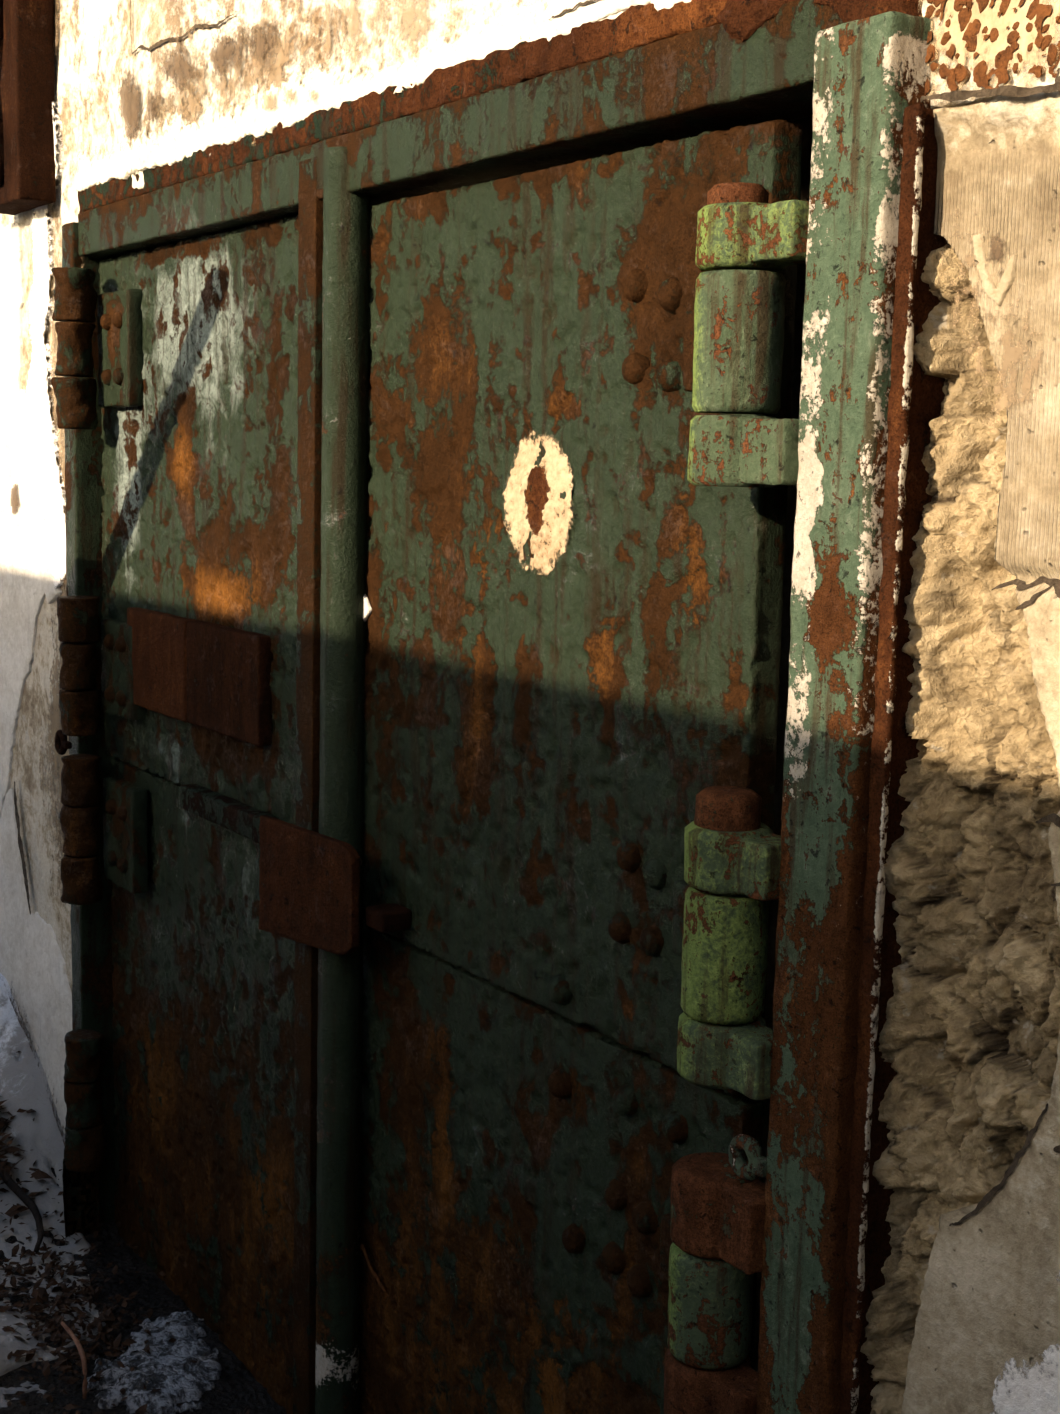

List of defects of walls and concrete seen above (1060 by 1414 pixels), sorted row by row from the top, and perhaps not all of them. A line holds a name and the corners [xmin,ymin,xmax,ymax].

crack [130,0,237,54]
water stain [148,0,473,131]
peeling [52,0,691,192]
corrosion [714,0,794,42]
corrosion [814,0,1060,96]
peeling [0,204,72,1134]
spalling [860,232,1060,1414]